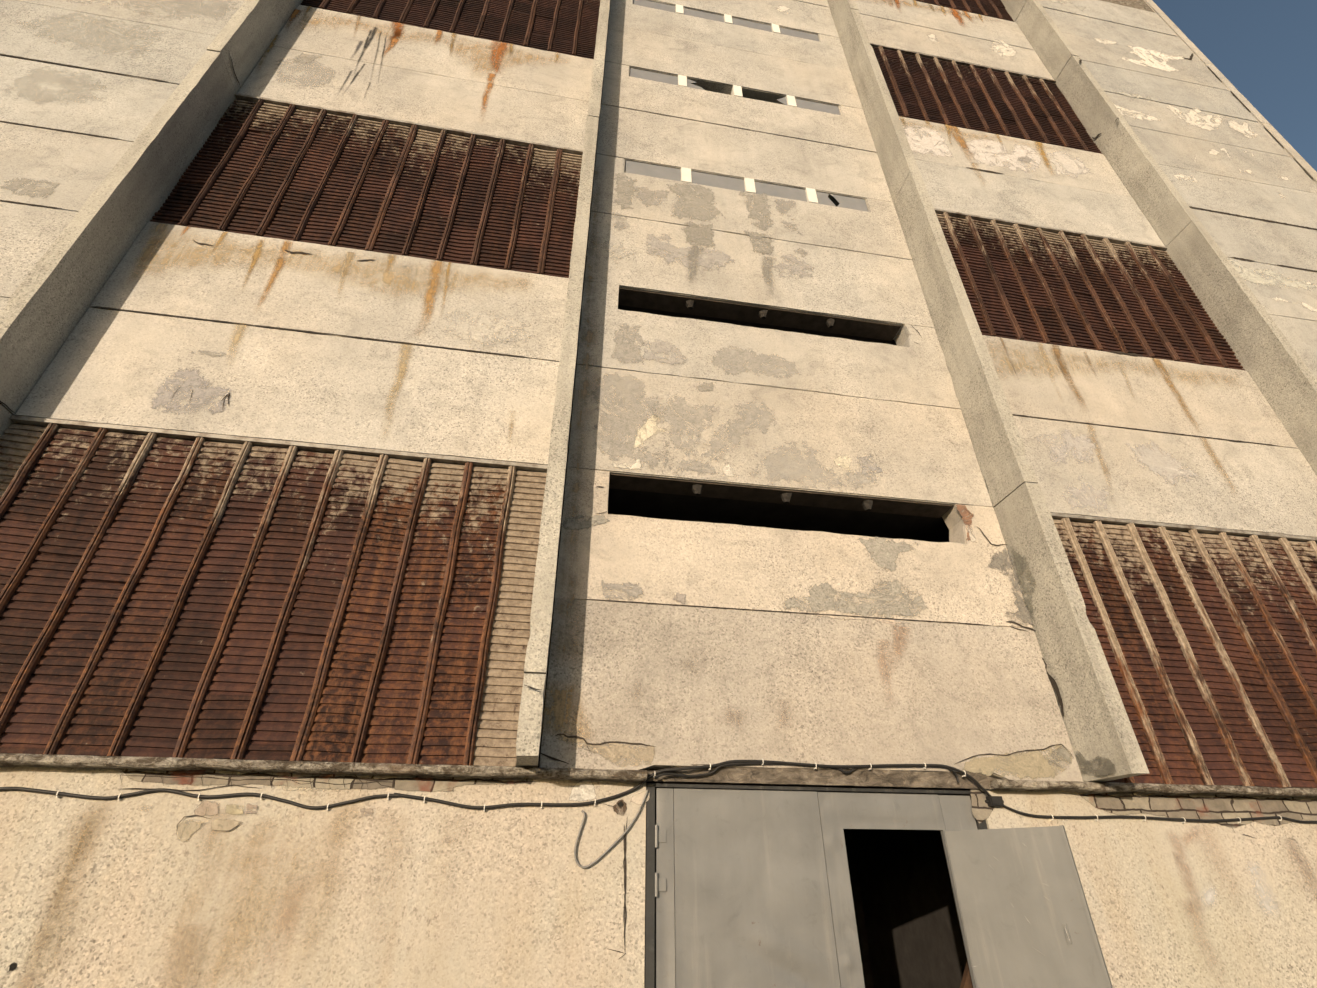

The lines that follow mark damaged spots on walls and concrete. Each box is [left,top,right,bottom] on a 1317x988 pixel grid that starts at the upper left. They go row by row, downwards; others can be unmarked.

peeling [1,178,59,199]
peeling [614,173,723,221]
peeling [740,192,800,234]
rust [142,223,296,298]
rust [325,252,476,315]
rust [392,345,410,392]
peeling [593,325,775,476]
peeling [712,347,798,378]
rust [1000,338,1079,397]
rust [1153,359,1191,418]
peeling [784,537,928,625]
crack [1006,621,1064,717]